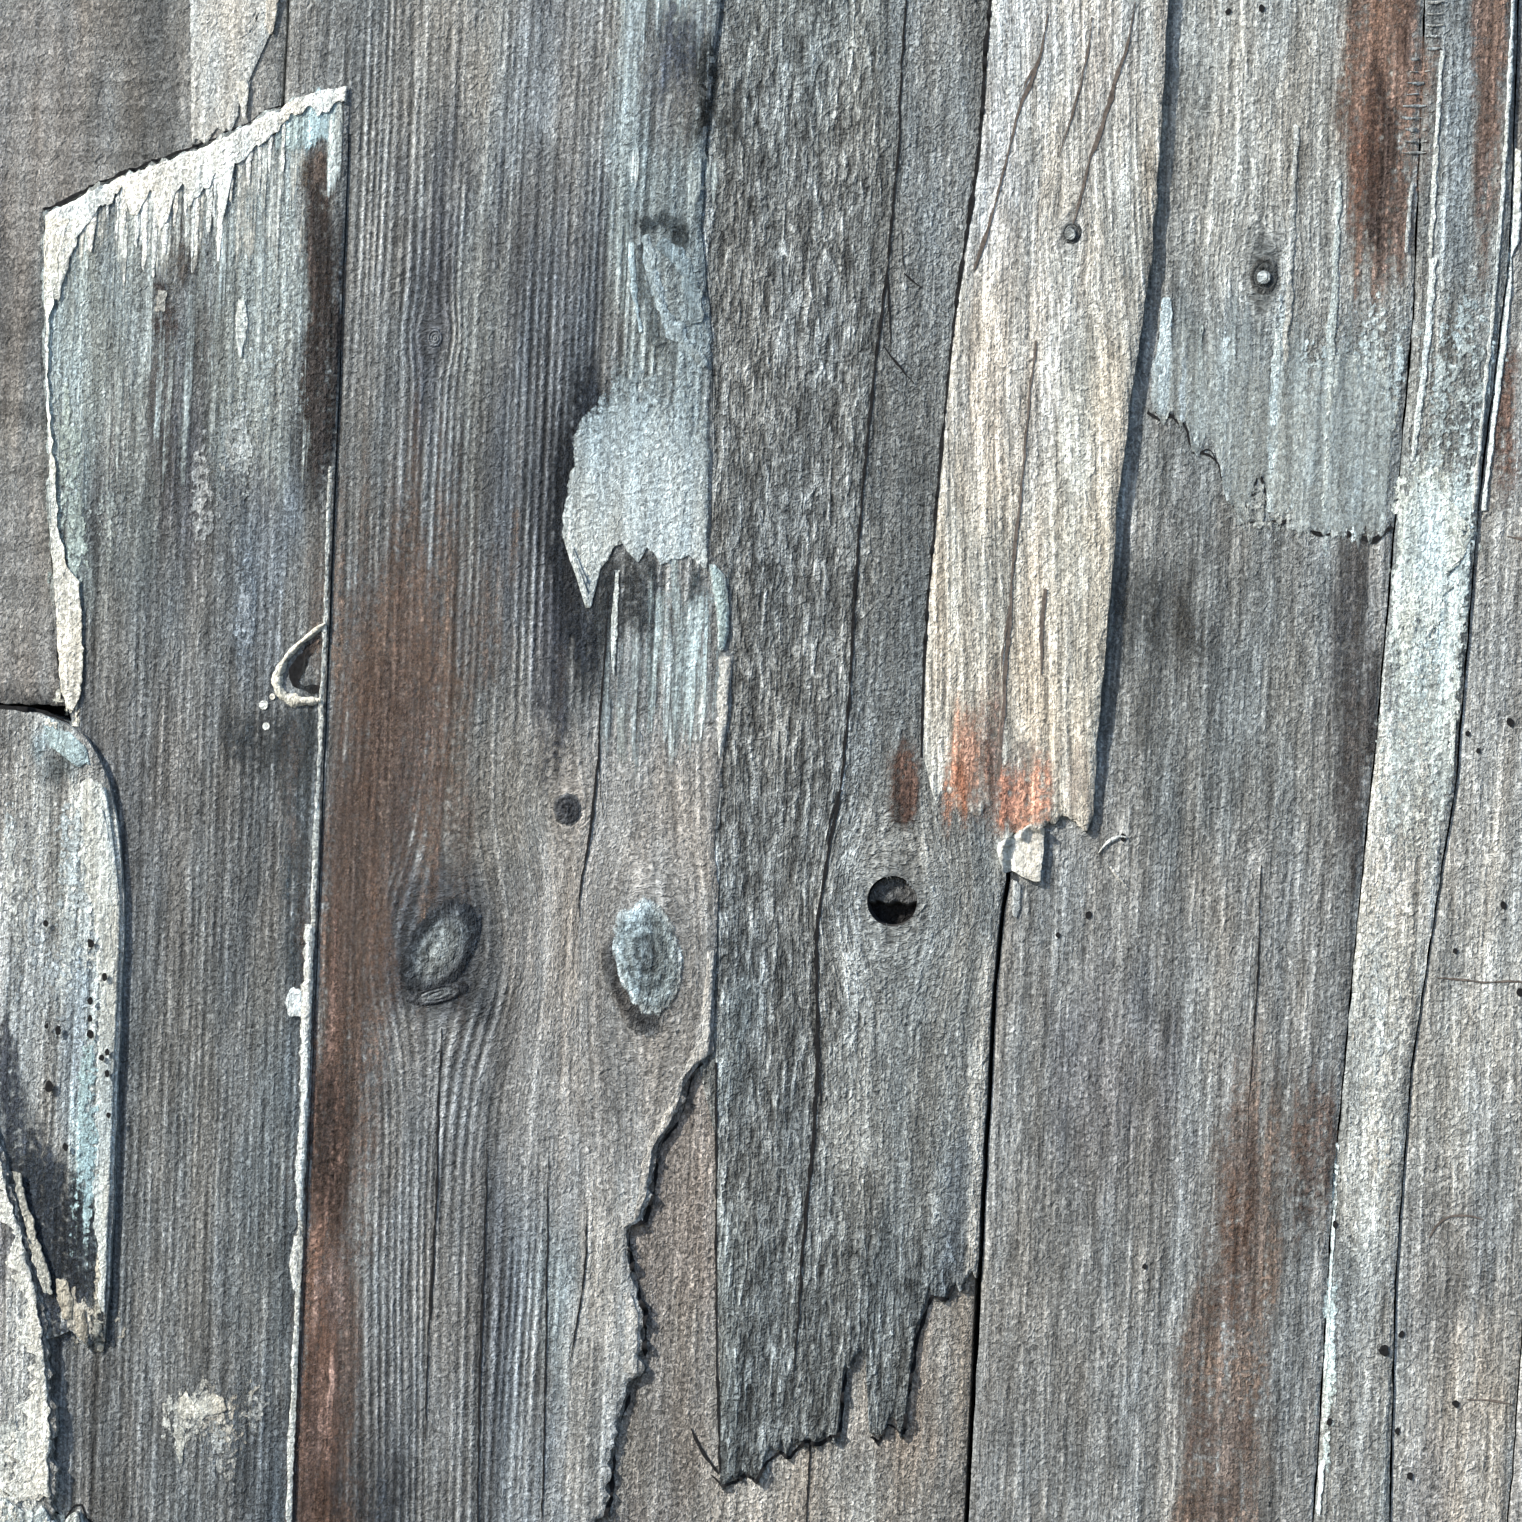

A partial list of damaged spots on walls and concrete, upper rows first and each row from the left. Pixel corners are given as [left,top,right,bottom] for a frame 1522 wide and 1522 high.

peeling [618,220,708,367]
corrosion [1337,0,1431,298]
peeling [0,0,348,1522]
crack [576,591,609,938]
peeling [562,358,731,767]
corrosion [891,742,919,824]
crack [791,0,1048,1400]
corrosion [943,700,1087,833]
peeling [997,824,1045,917]
peeling [623,950,714,1227]
crack [541,1133,587,1522]
crack [600,1062,967,1522]